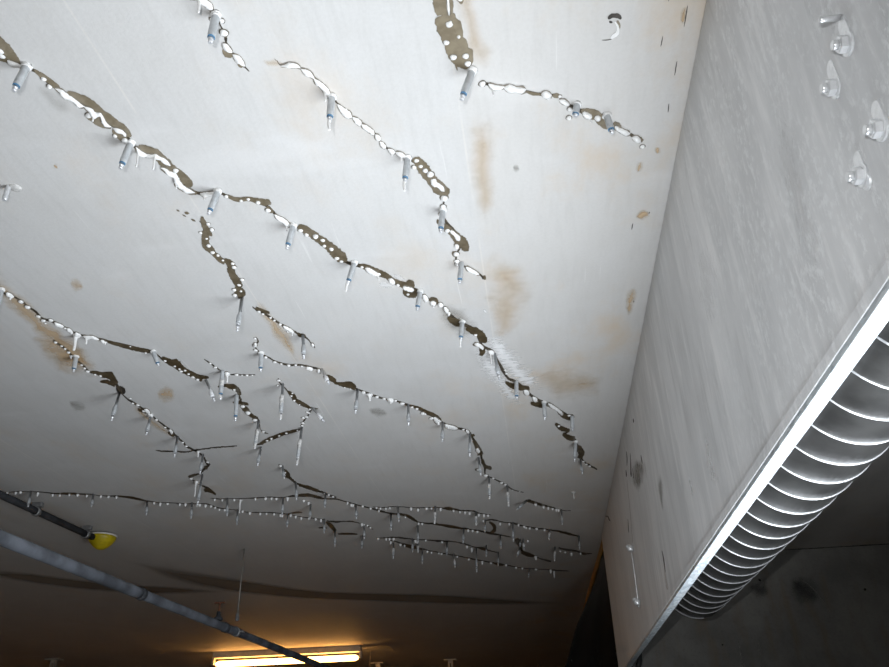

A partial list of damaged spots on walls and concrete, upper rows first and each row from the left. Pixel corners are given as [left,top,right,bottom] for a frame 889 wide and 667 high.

crack [196,0,249,71]
crack [433,0,646,149]
crack [0,36,597,578]
leakage [477,338,536,399]